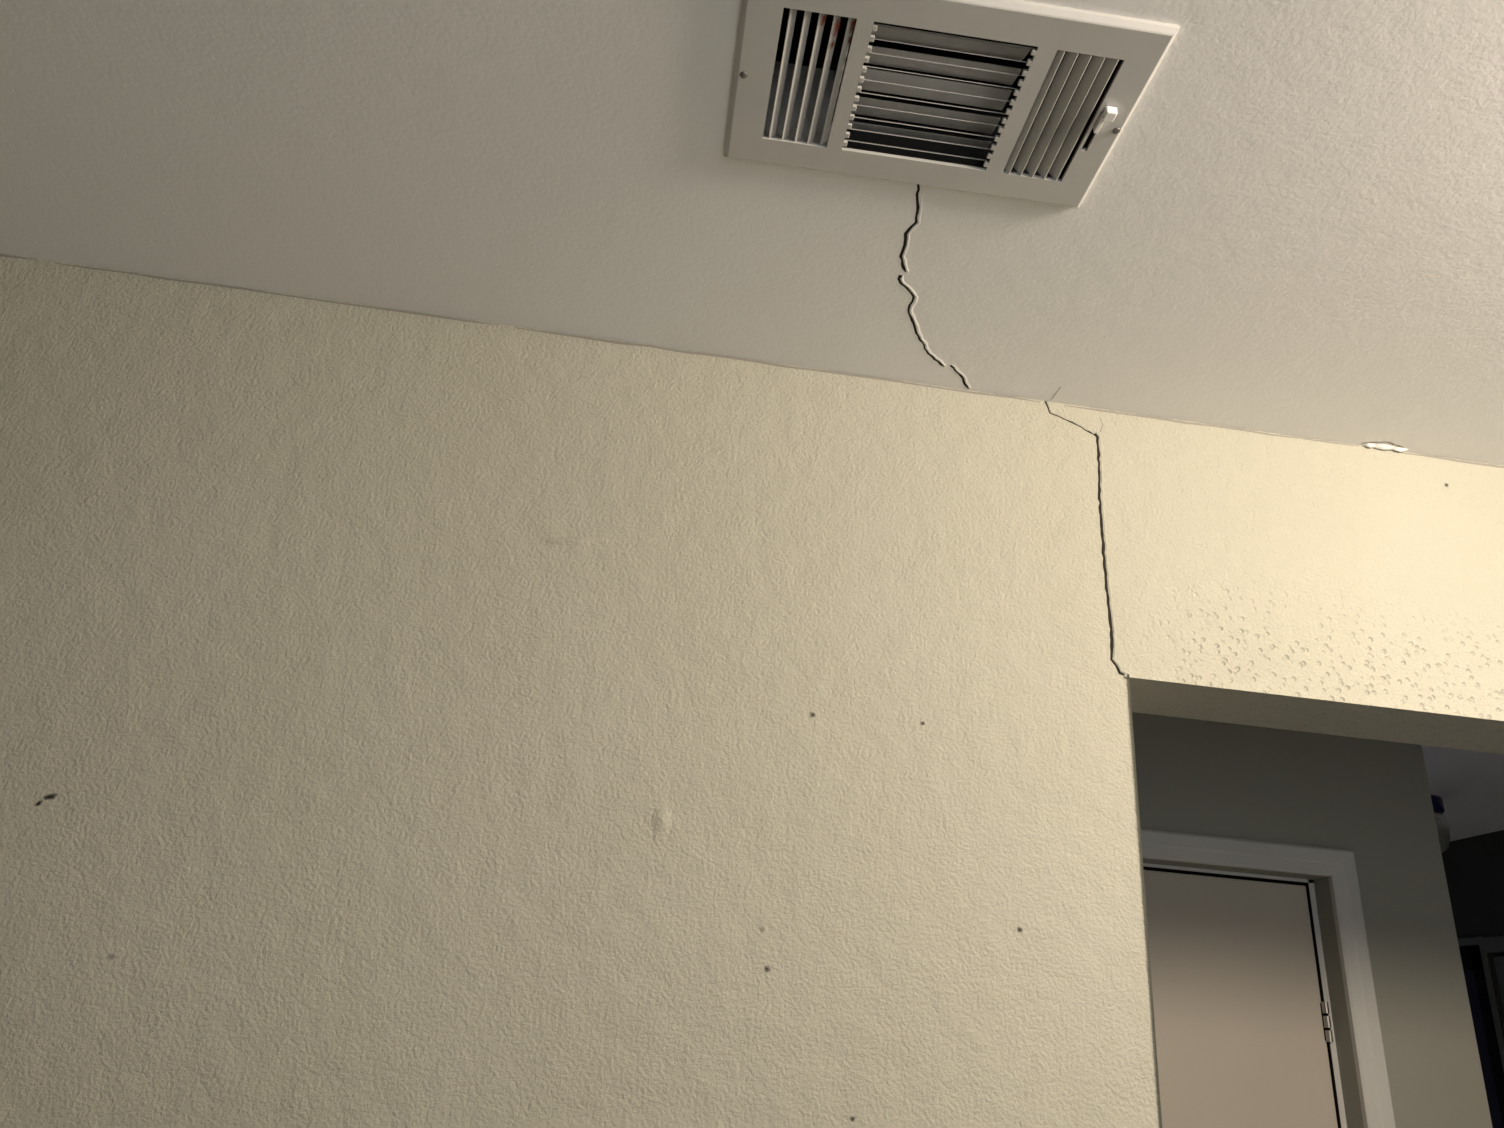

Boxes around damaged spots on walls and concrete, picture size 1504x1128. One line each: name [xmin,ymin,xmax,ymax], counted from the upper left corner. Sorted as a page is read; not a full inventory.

crack [0,184,1356,676]
crack [1404,453,1504,468]